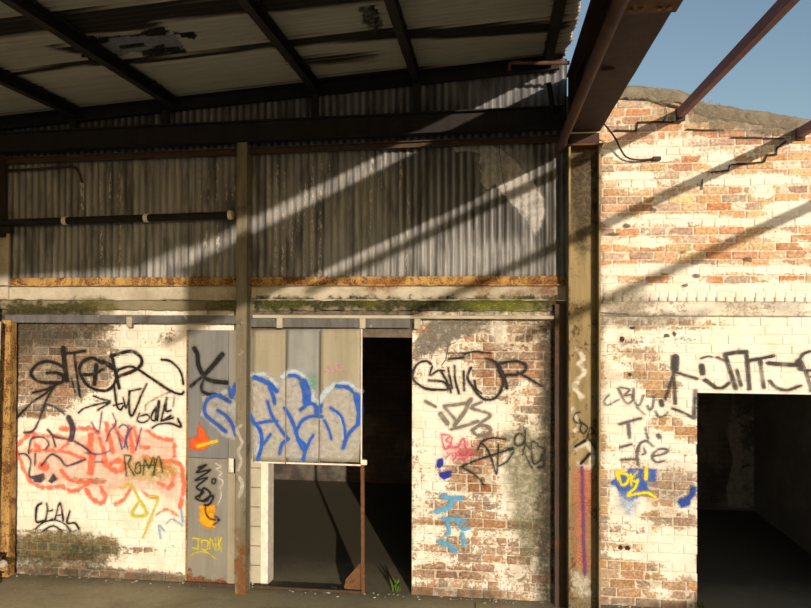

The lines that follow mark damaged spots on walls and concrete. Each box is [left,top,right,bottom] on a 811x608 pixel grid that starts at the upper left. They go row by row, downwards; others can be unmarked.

peeling [98,31,186,57]
crack [614,97,787,190]
corrosion [185,330,227,583]
corrosion [234,547,250,595]